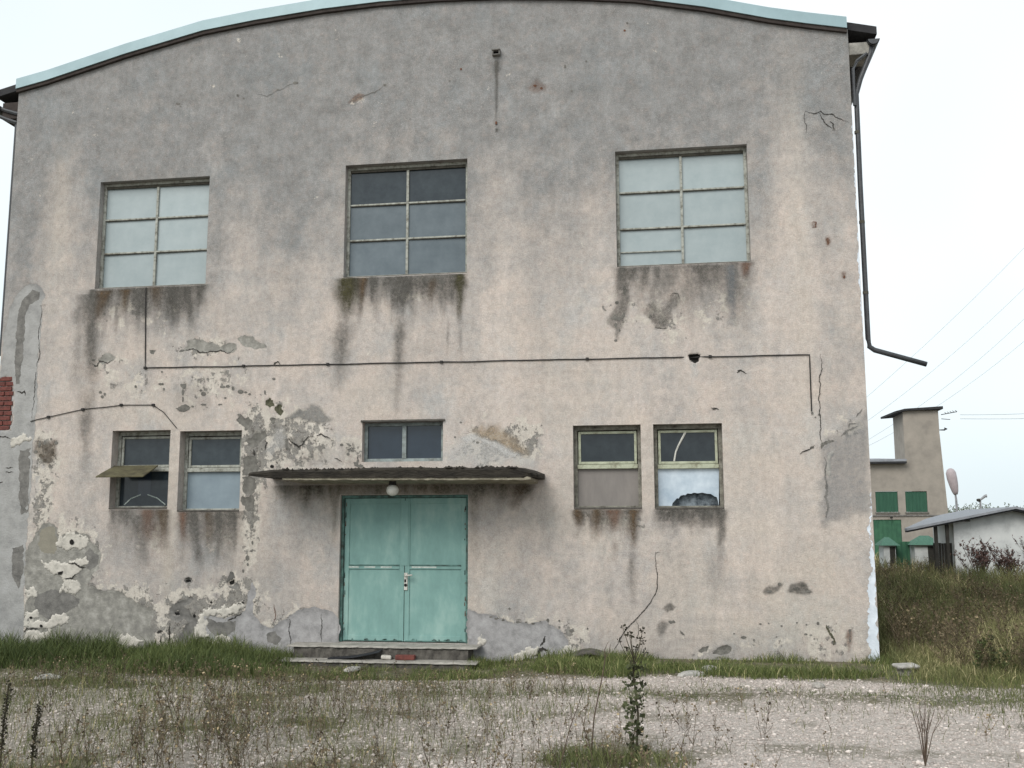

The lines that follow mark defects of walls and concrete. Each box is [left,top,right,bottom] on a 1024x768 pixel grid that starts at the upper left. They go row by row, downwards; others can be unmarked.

crack [804,111,848,131]
leakage [88,285,205,356]
leakage [338,274,464,311]
flaking render [0,284,396,653]
crack [800,357,862,517]
leakage [112,510,237,541]
leakage [574,509,637,538]
flaking render [764,582,811,594]
peeling [866,493,880,661]
flaking render [432,598,576,661]